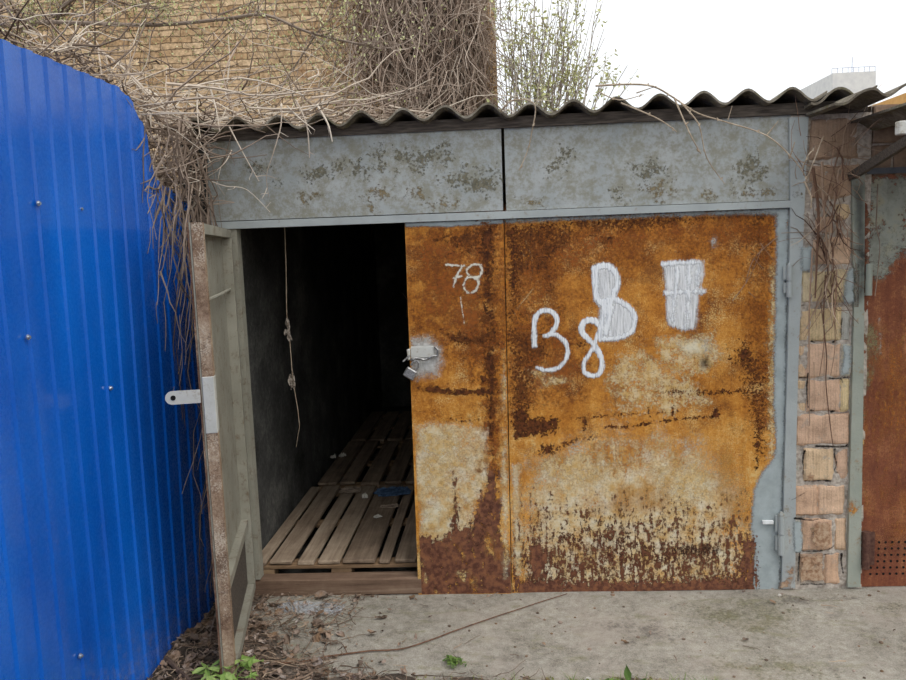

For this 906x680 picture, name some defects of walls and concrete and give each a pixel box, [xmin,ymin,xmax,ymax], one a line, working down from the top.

corrosion [406,213,777,594]
peeling [867,175,906,280]